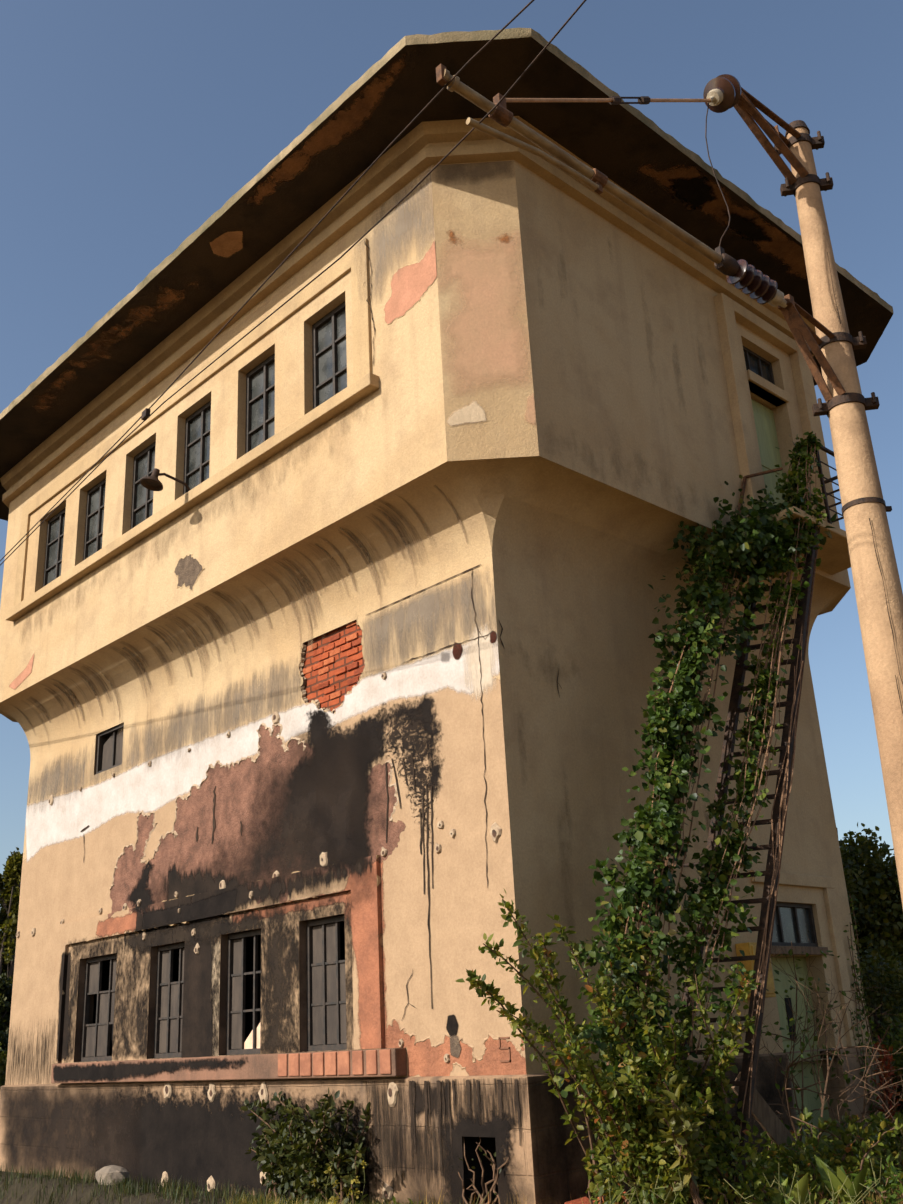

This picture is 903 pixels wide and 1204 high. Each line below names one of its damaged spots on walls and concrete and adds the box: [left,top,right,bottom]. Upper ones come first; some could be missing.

peeling [210,231,243,258]
crack [363,243,375,363]
peeling [383,241,437,325]
spalling [174,553,205,591]
flaking render [298,619,365,716]
flaking render [96,723,526,1077]
water stain [385,754,433,1009]
water stain [366,1078,527,1204]